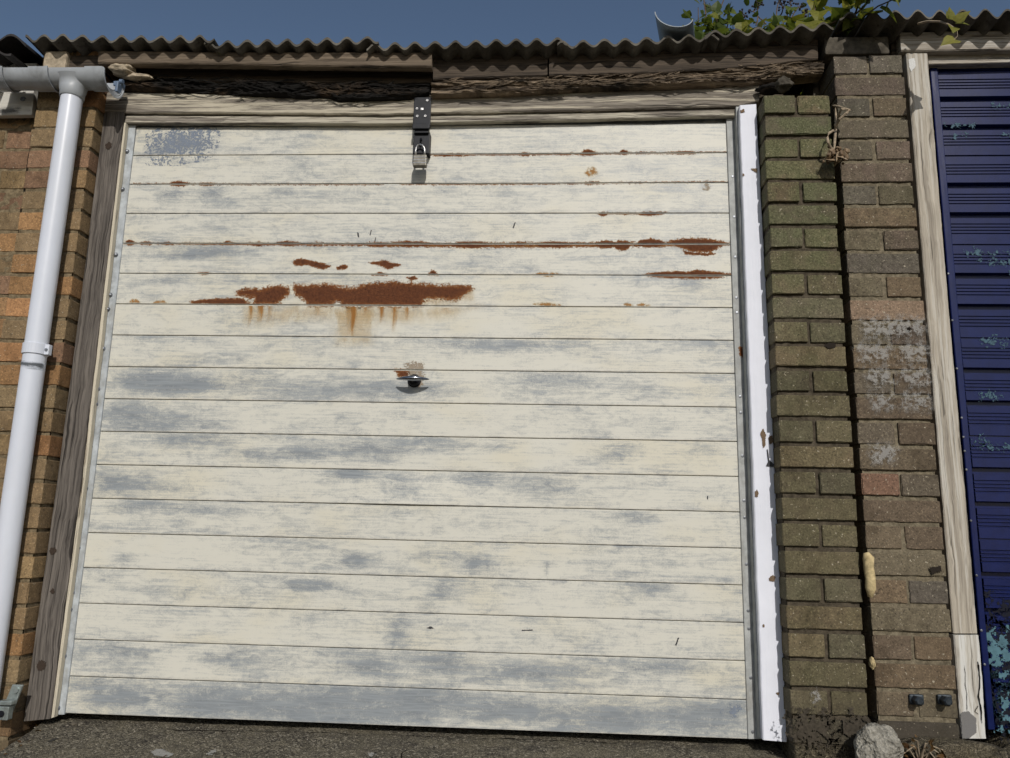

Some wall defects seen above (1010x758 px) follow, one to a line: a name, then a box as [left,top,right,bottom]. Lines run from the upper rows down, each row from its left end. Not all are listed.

corrosion [123,237,730,256]
corrosion [293,258,348,270]
corrosion [646,269,731,280]
corrosion [189,260,472,331]
peeling [961,590,1010,744]